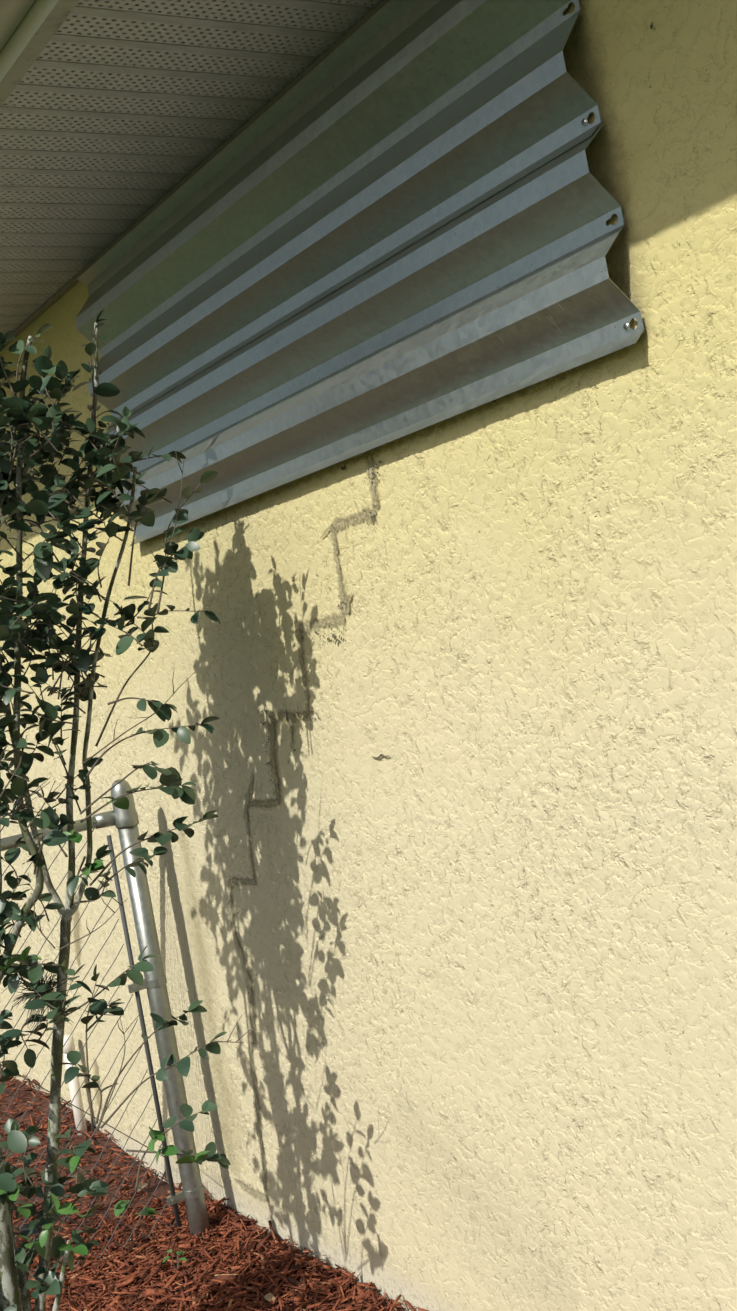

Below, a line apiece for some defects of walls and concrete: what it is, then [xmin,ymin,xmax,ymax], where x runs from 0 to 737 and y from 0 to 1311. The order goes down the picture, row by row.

crack [226,454,381,1202]